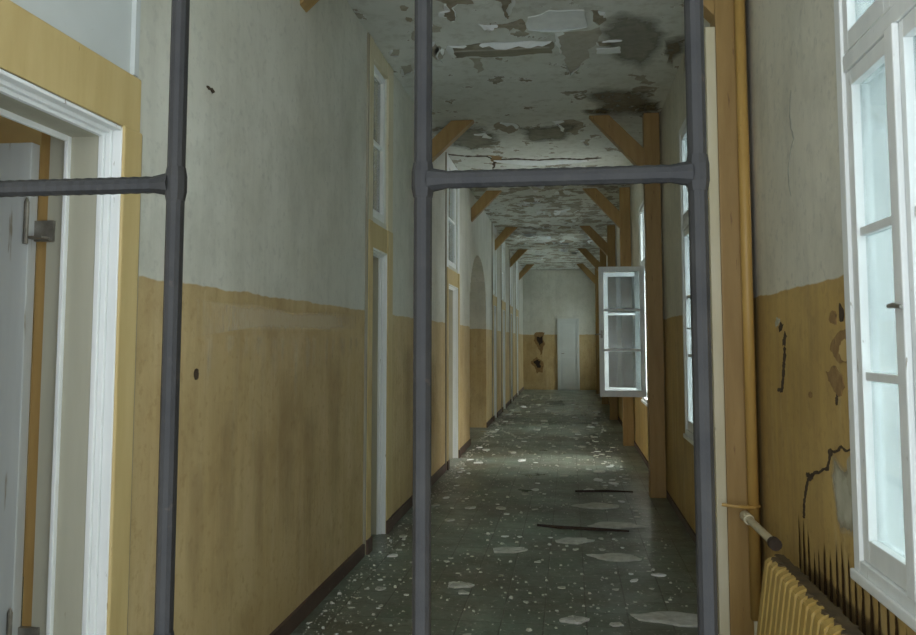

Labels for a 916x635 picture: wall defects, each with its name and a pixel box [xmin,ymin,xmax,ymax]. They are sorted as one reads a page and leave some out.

peeling [432,0,622,76]
damp [605,17,682,64]
peeling [474,122,520,139]
peeling [517,198,593,258]
crack [803,445,850,518]